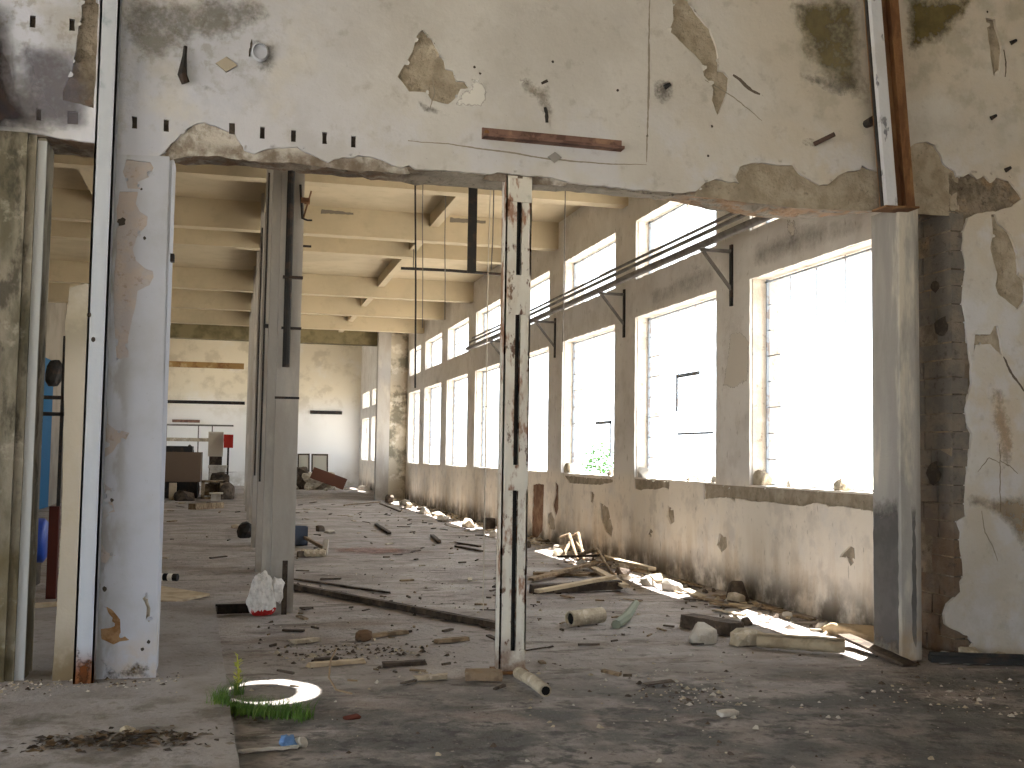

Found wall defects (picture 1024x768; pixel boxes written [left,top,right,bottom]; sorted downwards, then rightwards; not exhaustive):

damp [134,1,254,53]
spalling [398,31,486,111]
spalling [666,0,728,114]
damp [798,1,856,93]
damp [910,0,969,46]
spalling [483,170,567,186]
spalling [694,159,880,211]
peeling [114,123,410,361]
flaking render [910,142,1023,652]
crack [1003,357,1024,391]
spalling [532,475,613,538]
crack [978,444,1018,561]